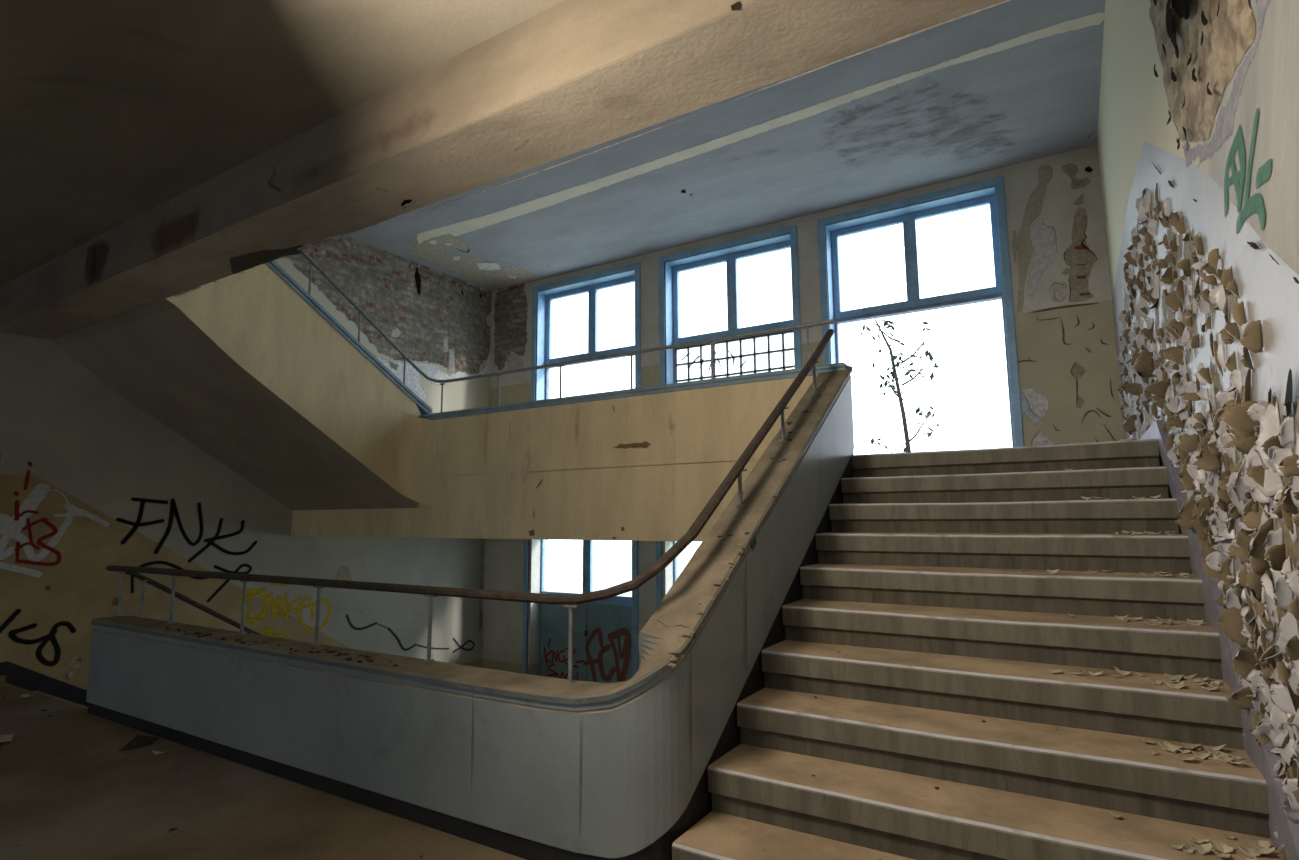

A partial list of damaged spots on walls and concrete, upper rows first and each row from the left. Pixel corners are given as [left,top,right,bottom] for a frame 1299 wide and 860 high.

spalling [401,113,699,218]
spalling [722,0,1011,105]
damp [832,94,1011,161]
spalling [1050,163,1097,302]
spalling [1149,0,1270,166]
flaking render [254,222,535,402]
peeling [1020,388,1054,446]
peeling [1115,163,1299,860]